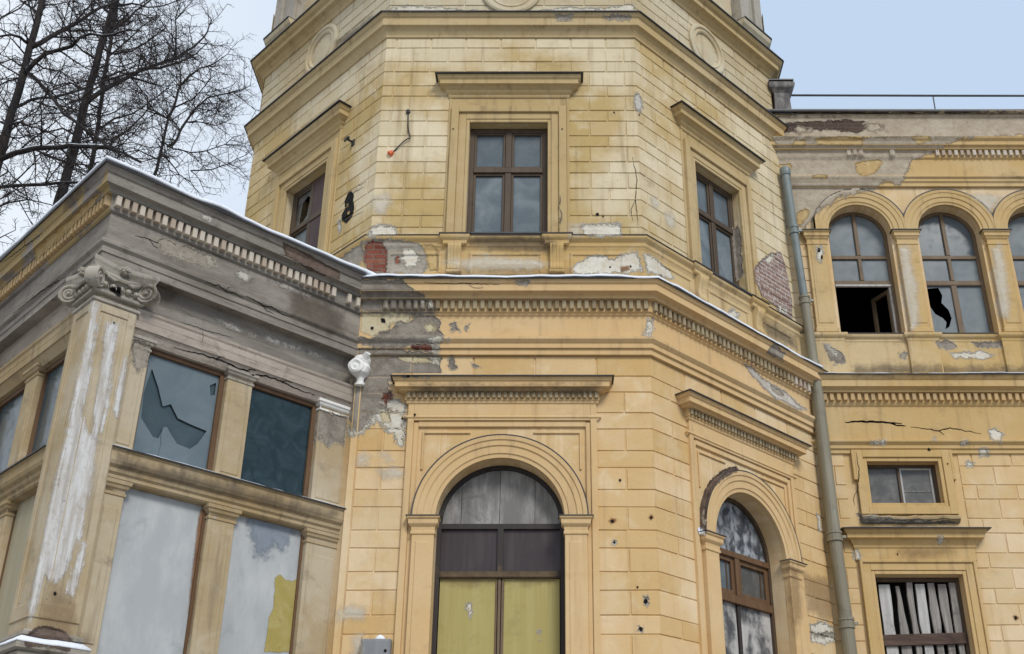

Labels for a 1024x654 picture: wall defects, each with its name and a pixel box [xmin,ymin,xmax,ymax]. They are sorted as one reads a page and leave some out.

flaking render [771,109,1024,229]
peeling [570,251,674,279]
flaking render [732,225,793,319]
crack [207,282,291,317]
crack [174,322,314,395]
flaking render [313,223,471,448]
flaking render [823,343,846,366]
peeling [935,339,1005,360]
peeling [744,364,807,411]
crack [846,420,982,435]
peeling [960,427,1005,468]
peeling [810,620,835,645]